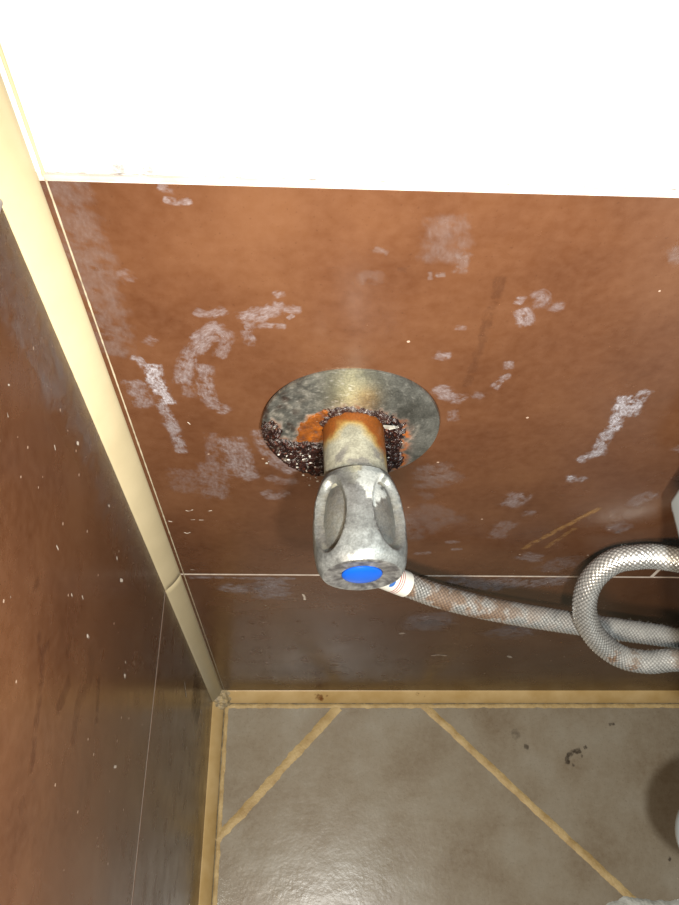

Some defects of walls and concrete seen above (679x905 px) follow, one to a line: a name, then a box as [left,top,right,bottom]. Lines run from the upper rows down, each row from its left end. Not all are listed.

rust [261,406,406,477]